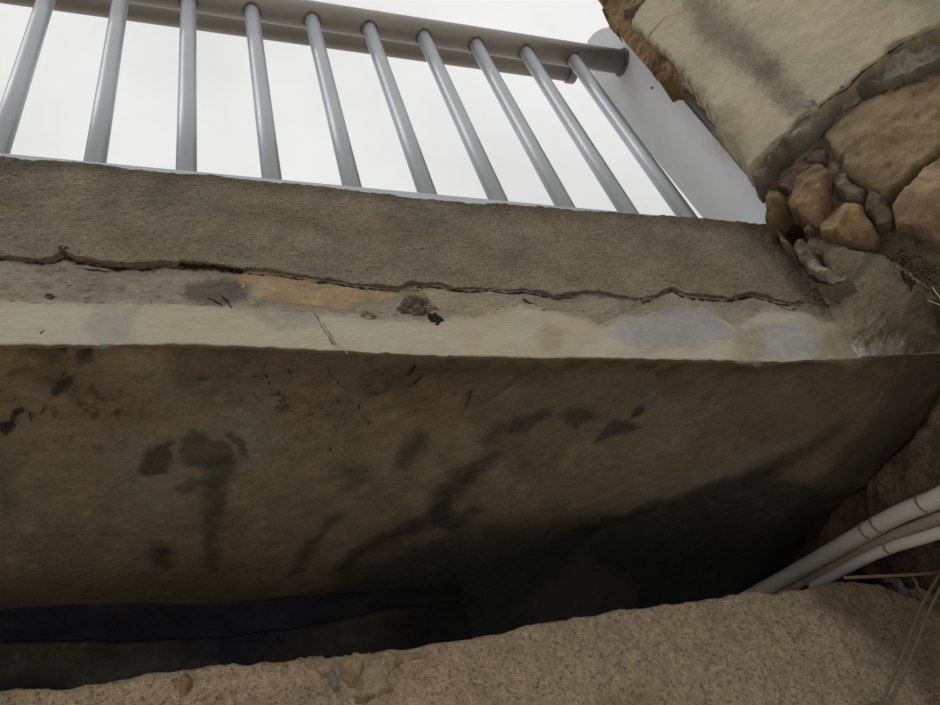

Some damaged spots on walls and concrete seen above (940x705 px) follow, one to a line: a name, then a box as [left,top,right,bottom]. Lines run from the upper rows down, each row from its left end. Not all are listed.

crack [0,257,188,272]
crack [238,272,562,299]
crack [642,290,797,311]
water stain [141,431,247,569]